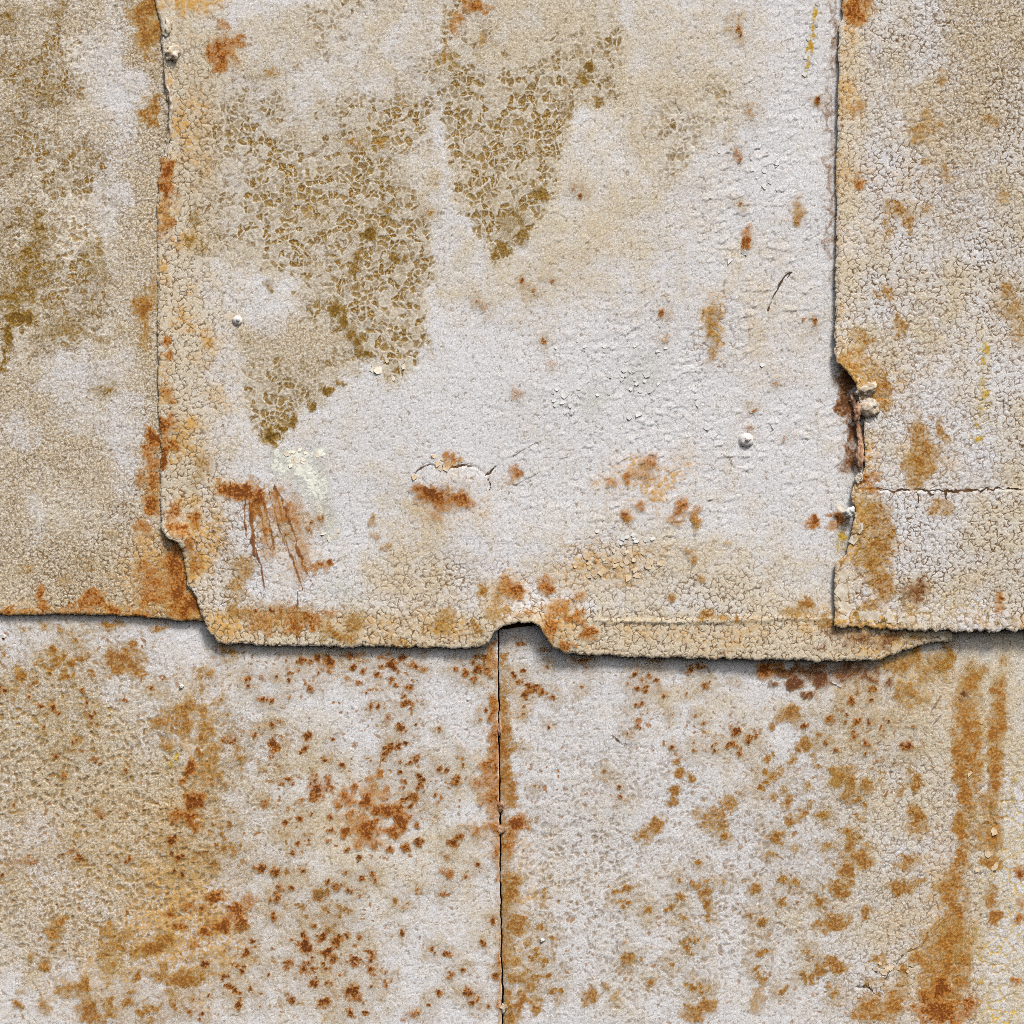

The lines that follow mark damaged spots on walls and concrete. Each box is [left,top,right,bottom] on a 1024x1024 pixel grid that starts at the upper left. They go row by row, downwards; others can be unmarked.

peeling [369,352,414,381]
rust [0,388,204,641]
rust [409,484,475,518]
crack [415,441,541,490]
rust [806,328,930,610]
crack [859,487,1021,509]
rust [214,477,444,861]
rust [471,574,599,668]
rust [151,666,306,920]
rust [632,745,696,845]
rust [711,596,1011,1024]
rust [282,871,393,1018]